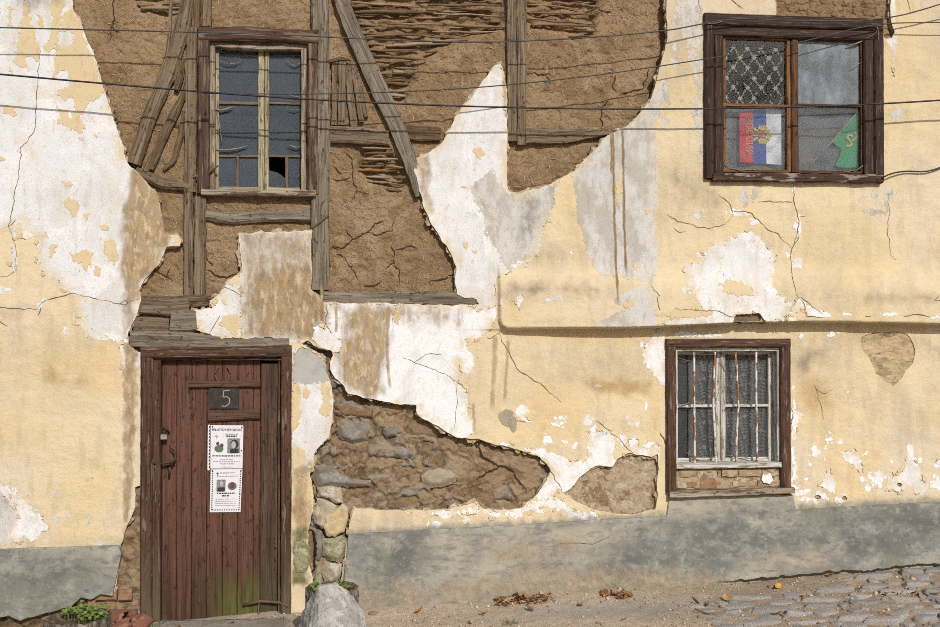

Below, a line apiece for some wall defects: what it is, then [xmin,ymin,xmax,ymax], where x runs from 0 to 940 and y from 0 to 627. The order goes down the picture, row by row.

crack [0,51,41,277]
peeling [0,0,311,372]
peeling [862,186,898,216]
crack [670,186,819,317]
crack [0,293,137,326]
spalling [182,0,831,584]
crack [651,286,752,318]
crack [404,353,463,427]
crack [489,332,561,402]
spalling [861,332,915,386]
peeling [791,385,940,506]